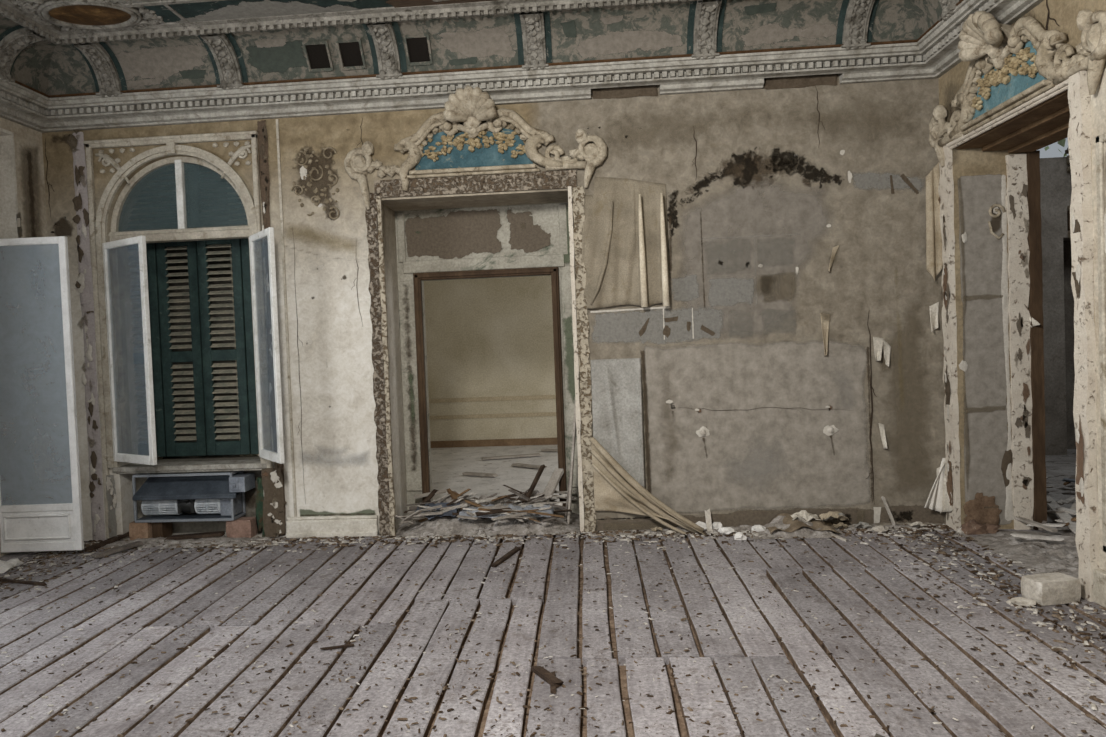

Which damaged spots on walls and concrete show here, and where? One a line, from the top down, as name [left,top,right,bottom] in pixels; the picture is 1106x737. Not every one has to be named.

peeling [115,42,208,87]
peeling [246,38,308,73]
peeling [437,27,516,66]
peeling [560,15,684,59]
peeling [72,165,89,263]
flaking render [405,209,551,259]
water stain [667,148,842,270]
peeling [1072,215,1081,233]
peeling [1072,264,1081,297]
peeling [1075,415,1085,504]
flaking render [261,462,287,537]